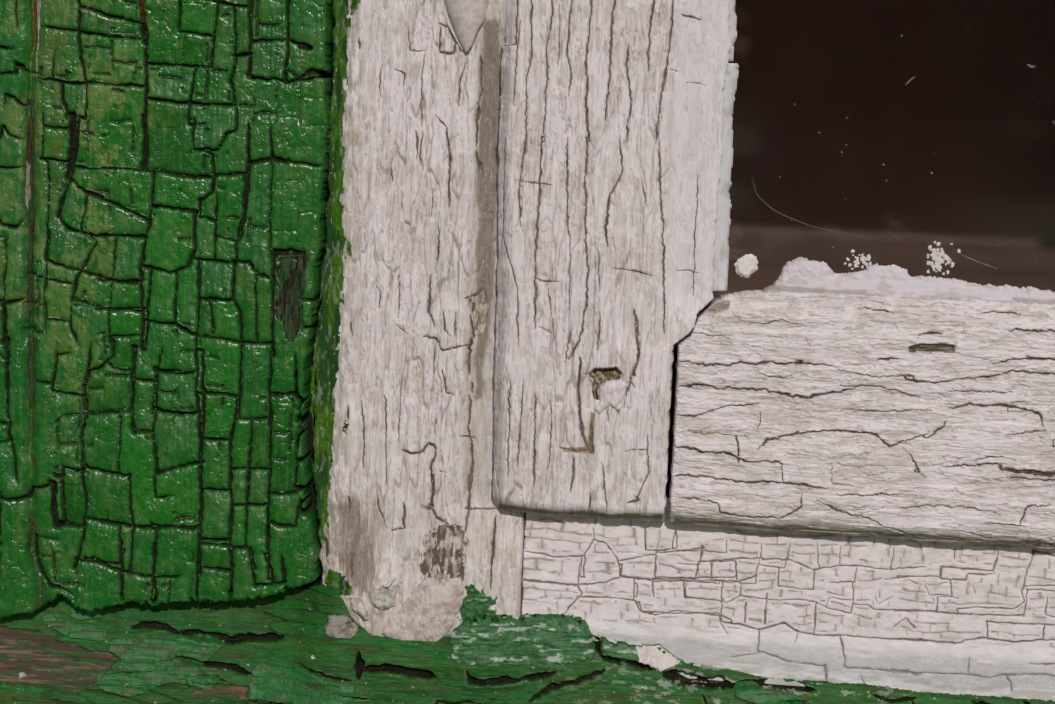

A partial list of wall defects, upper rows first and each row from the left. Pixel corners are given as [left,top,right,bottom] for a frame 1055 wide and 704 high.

crack [0,0,332,598]
peeling [274,247,310,343]
crack [347,0,1055,691]
crack [325,536,353,578]
peeling [416,520,469,582]
peeling [324,576,398,639]
peeling [0,606,356,704]
peeling [635,644,680,672]
peeling [733,680,808,704]